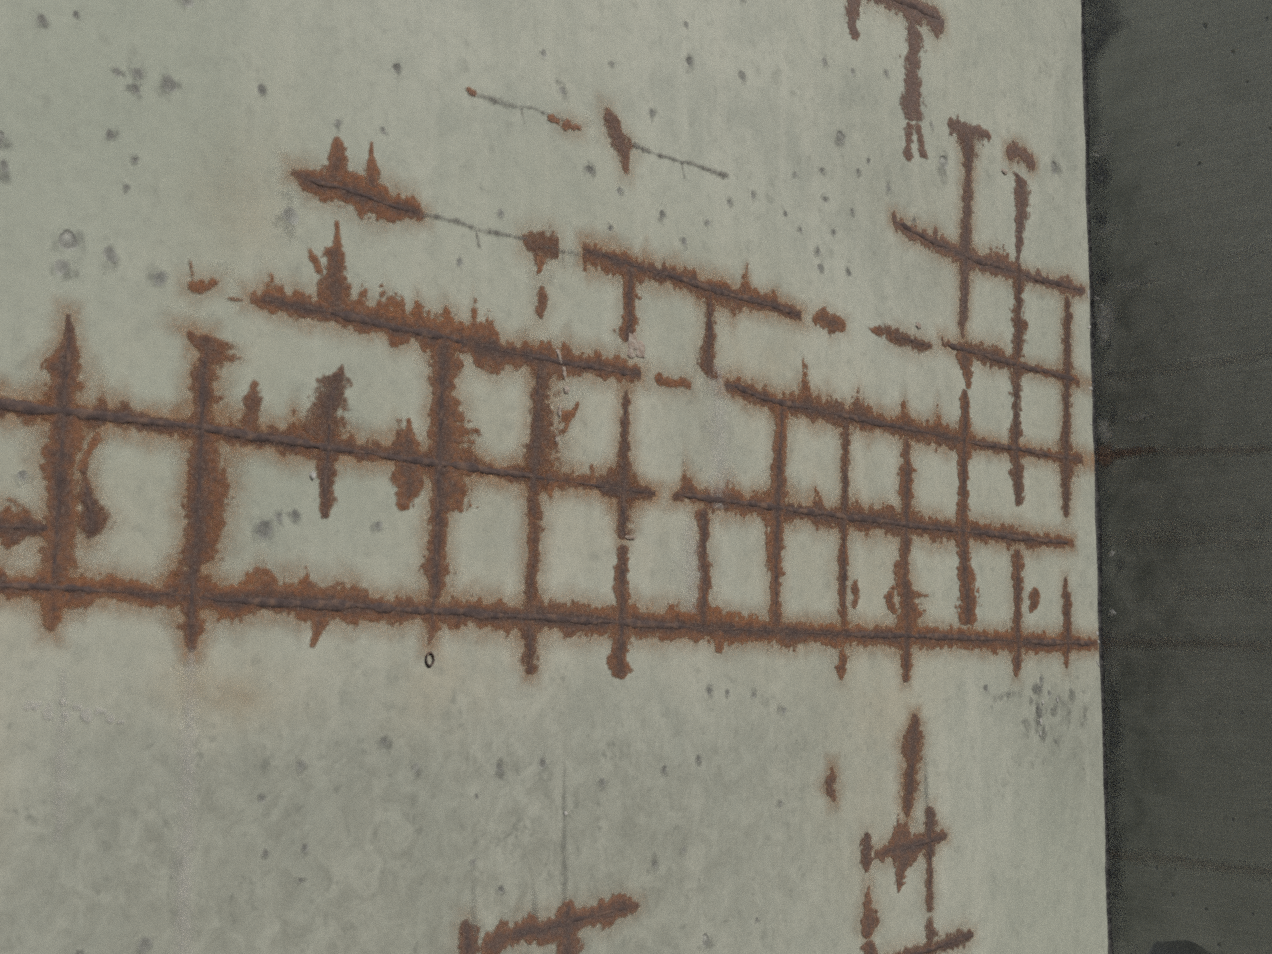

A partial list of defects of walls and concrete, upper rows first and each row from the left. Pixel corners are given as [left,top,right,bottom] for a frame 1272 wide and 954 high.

crack [634,144,728,178]
corrosion [845,0,944,162]
corrosion [0,108,1142,682]
corrosion [860,710,974,954]
corrosion [458,893,640,954]